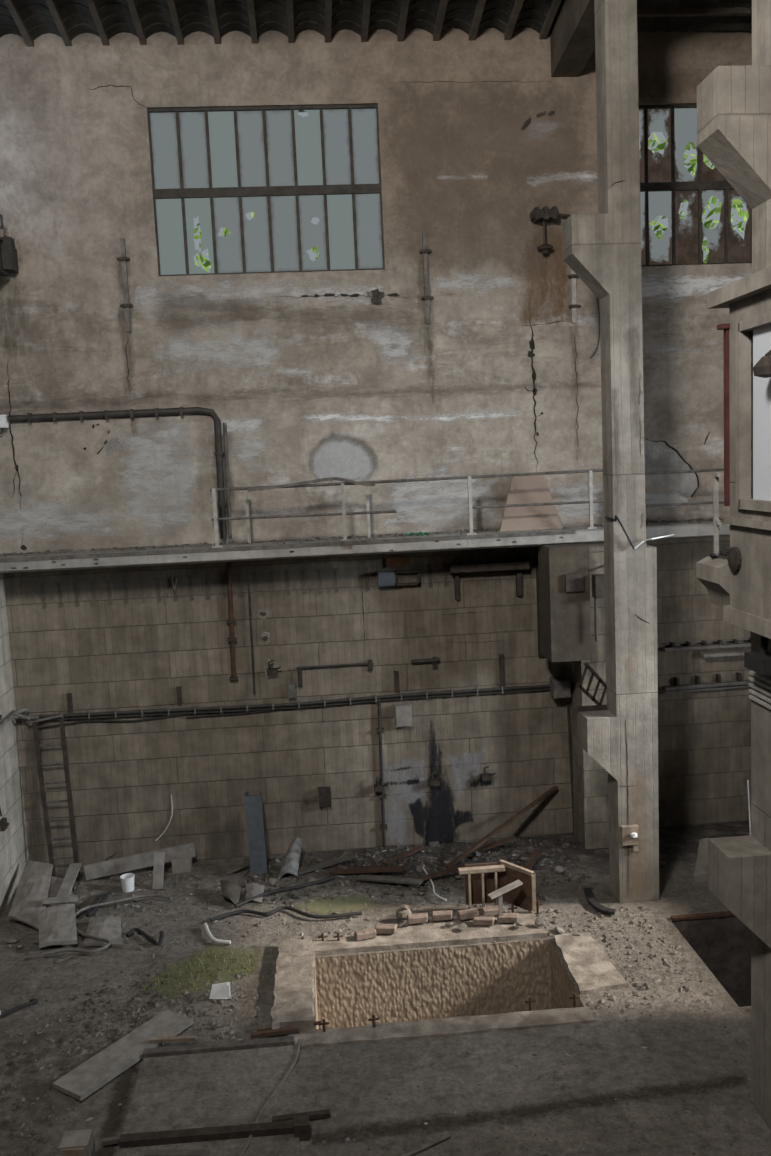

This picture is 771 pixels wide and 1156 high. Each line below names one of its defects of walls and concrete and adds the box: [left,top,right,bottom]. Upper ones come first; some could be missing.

crack [7,365,27,550]
crack [523,294,579,472]
damp [410,799,428,839]
damp [453,810,473,827]